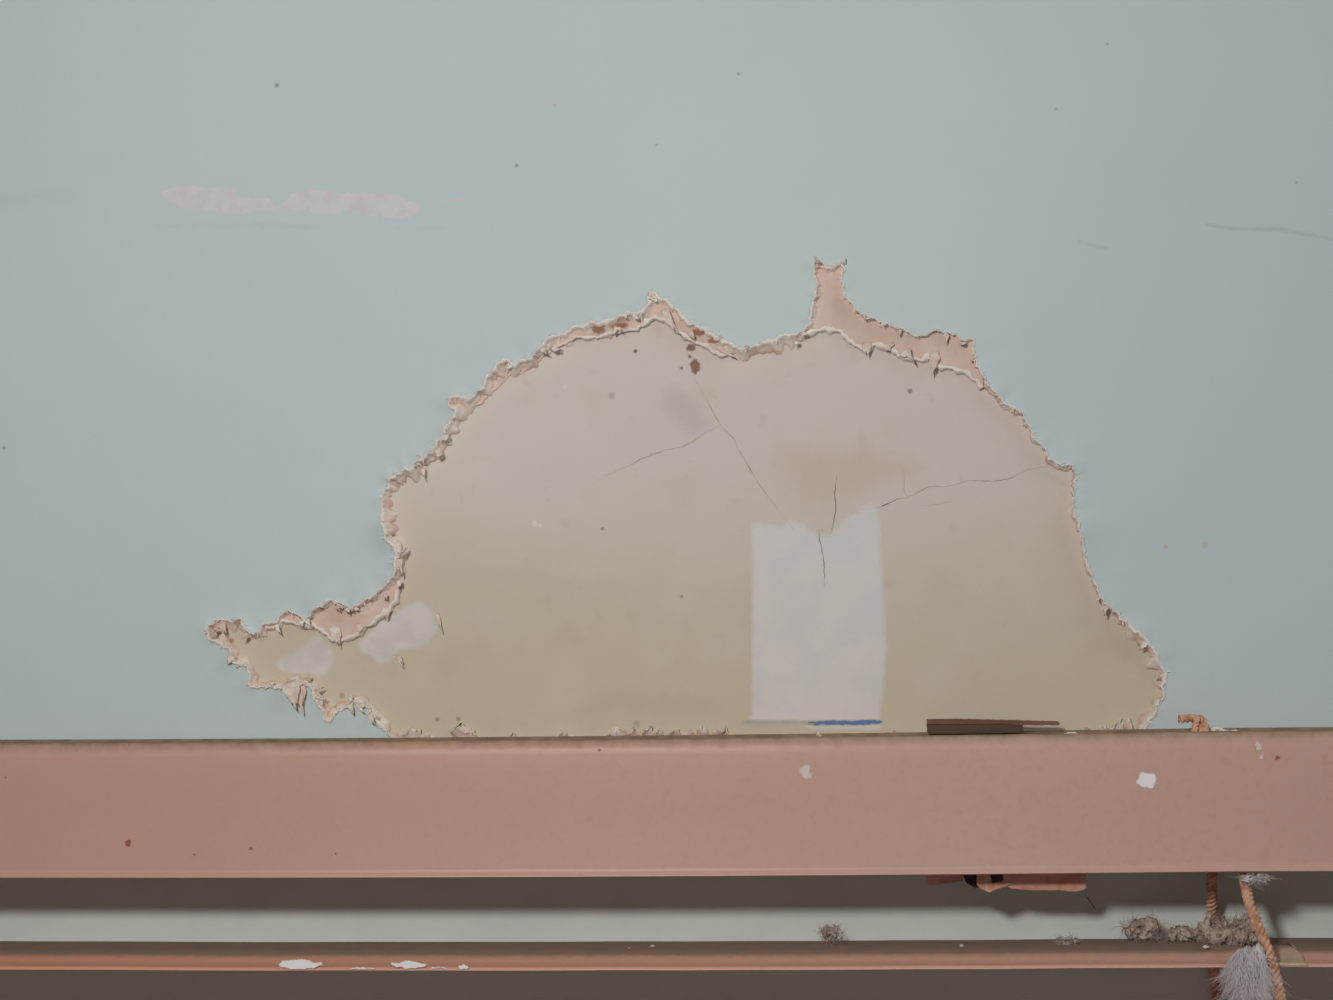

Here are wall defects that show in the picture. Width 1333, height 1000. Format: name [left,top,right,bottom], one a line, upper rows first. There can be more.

crack [544,378,1039,582]
peeling [282,674,326,716]
peeling [450,722,476,737]
peeling [1079,717,1133,730]
peeling [1136,772,1156,789]
peeling [279,959,322,970]
peeling [391,961,468,969]